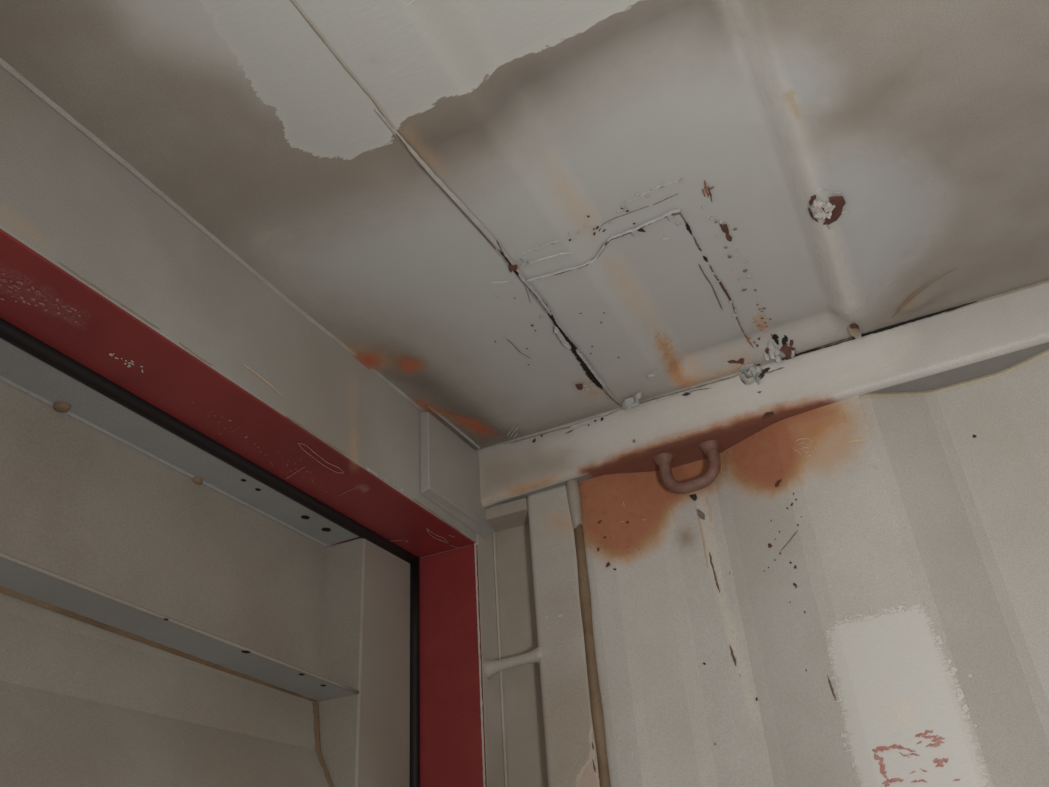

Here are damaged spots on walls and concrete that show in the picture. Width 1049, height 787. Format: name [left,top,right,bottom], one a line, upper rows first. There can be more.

corrosion [352,348,425,374]
crack [396,134,1049,445]
corrosion [579,399,857,570]